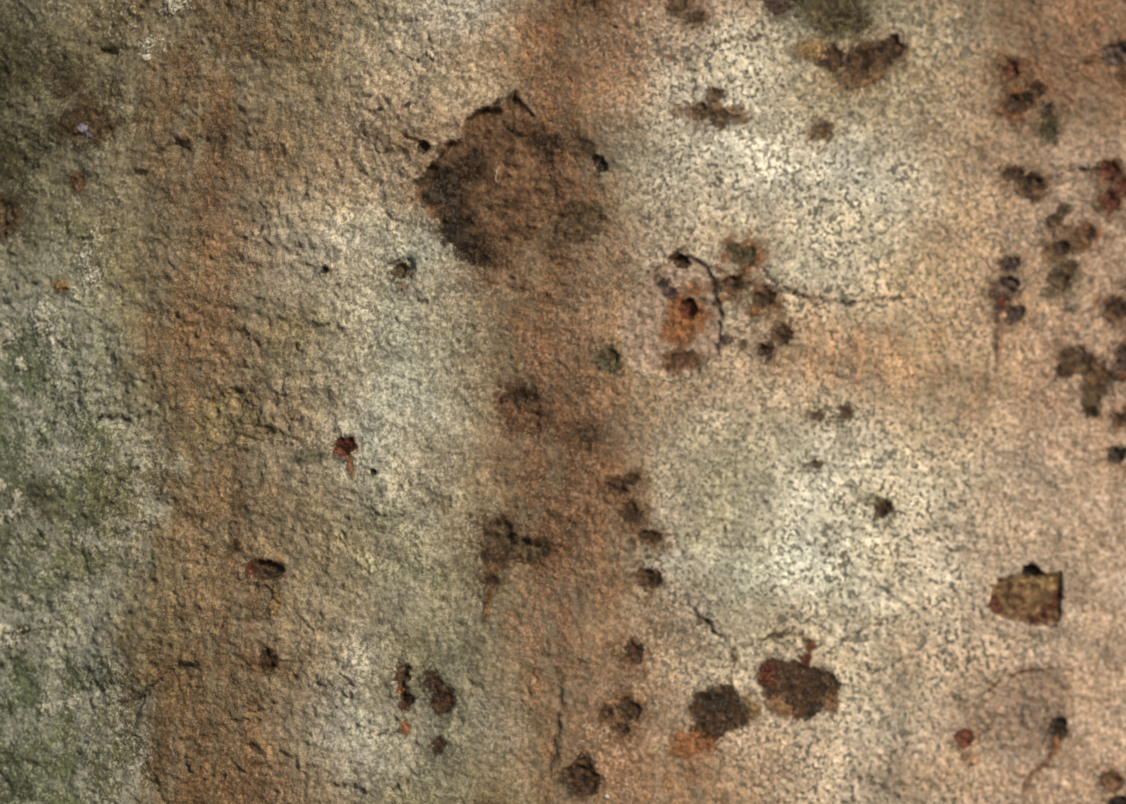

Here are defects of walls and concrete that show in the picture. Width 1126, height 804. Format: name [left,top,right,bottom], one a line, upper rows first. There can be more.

spalling [413,89,608,296]
rust [297,431,370,478]
spalling [988,564,1082,651]
spalling [669,631,842,759]
spalling [951,666,1073,753]